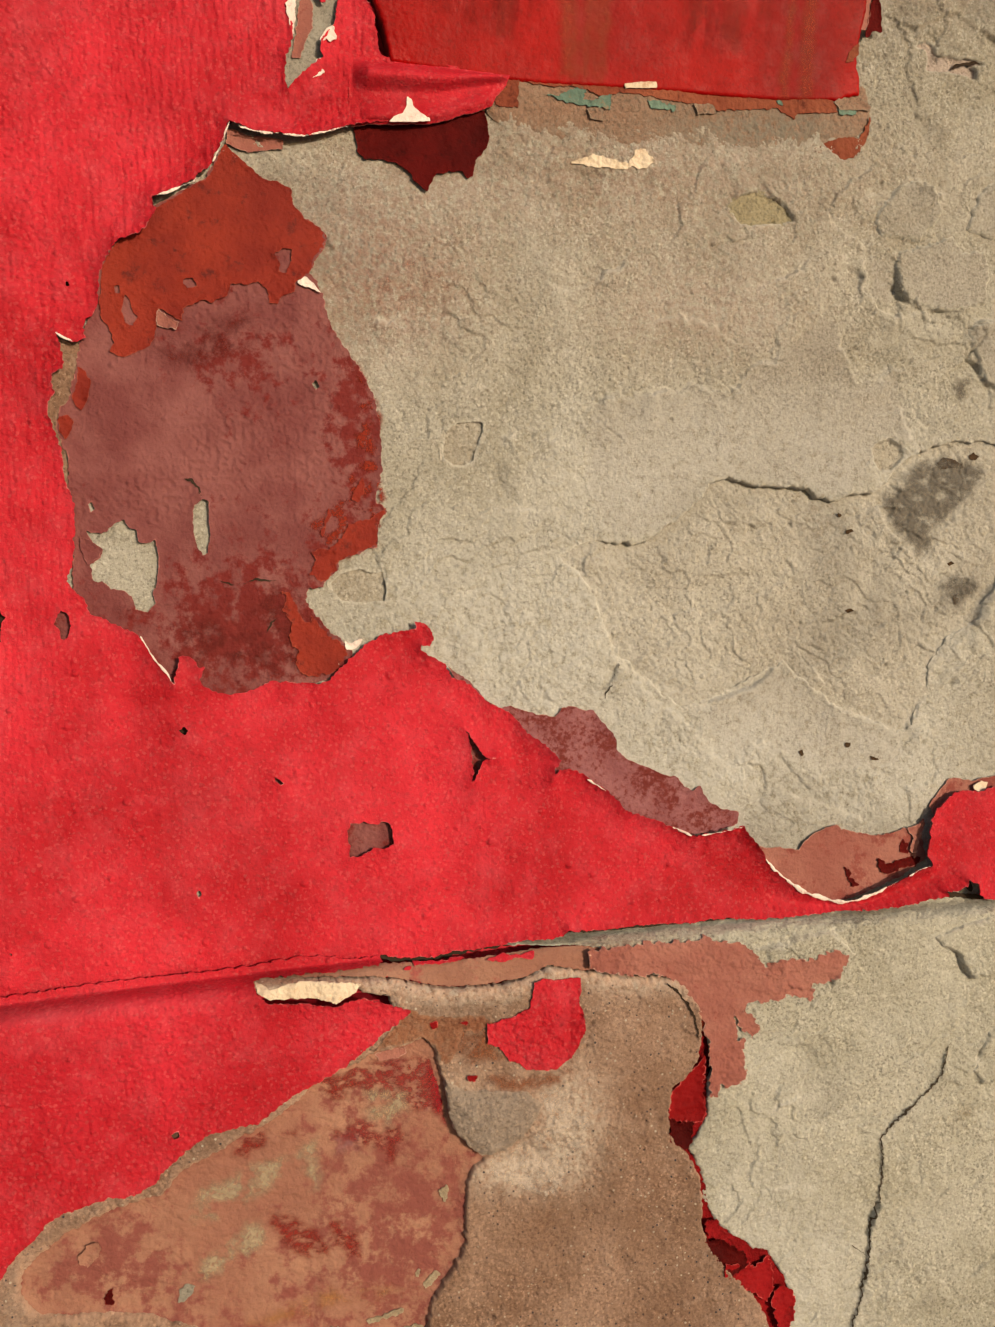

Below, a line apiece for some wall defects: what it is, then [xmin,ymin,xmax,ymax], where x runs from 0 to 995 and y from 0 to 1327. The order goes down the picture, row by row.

spalling [47,0,995,901]
crack [380,941,520,962]
crack [568,917,734,933]
crack [947,881,983,900]
spalling [0,1089,308,1327]
spalling [254,880,995,1327]
crack [851,1043,951,1327]